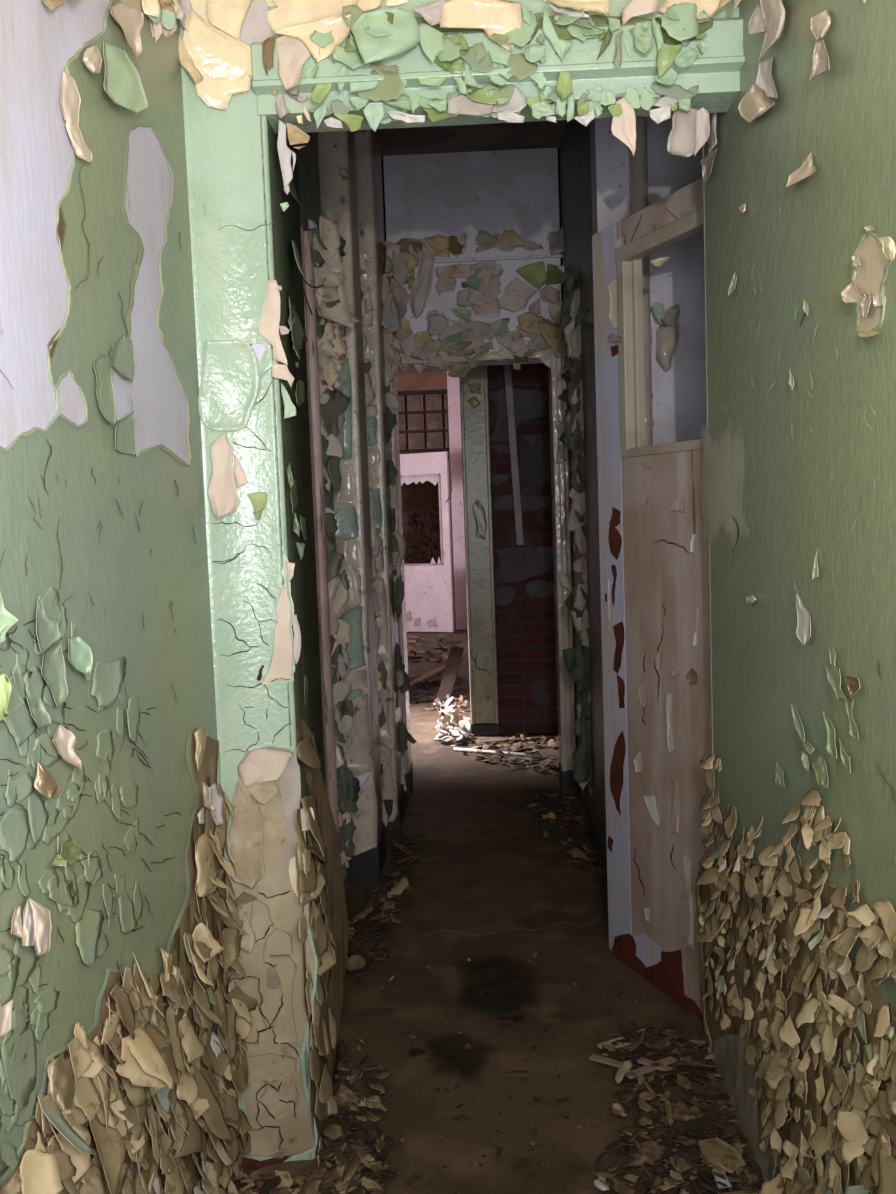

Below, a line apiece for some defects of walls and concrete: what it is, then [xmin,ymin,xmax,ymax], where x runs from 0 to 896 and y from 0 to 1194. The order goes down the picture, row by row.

peeling [809,10,831,82]
peeling [0,0,785,468]
peeling [841,225,896,338]
crack [231,382,272,451]
crack [0,439,152,666]
crack [193,522,270,564]
peeling [608,507,622,607]
crack [217,583,292,752]
peeling [0,215,594,1194]
crack [232,891,299,1057]
peeling [610,644,896,1194]
crack [253,1082,297,1148]